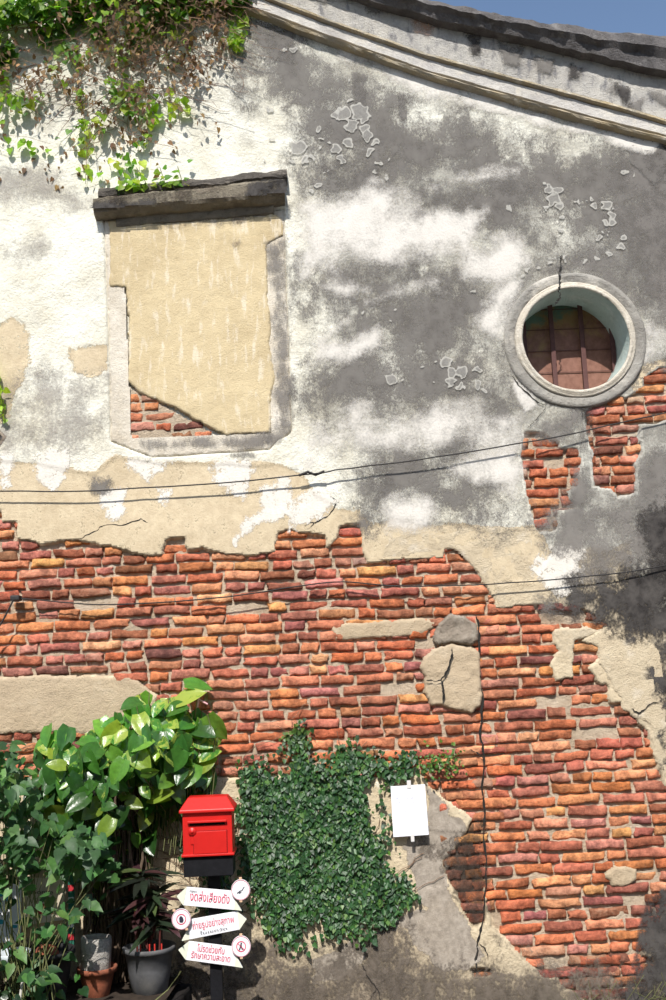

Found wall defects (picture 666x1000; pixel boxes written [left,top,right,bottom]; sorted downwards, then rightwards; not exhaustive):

leakage [91,16,666,540]
crack [555,256,563,305]
peeling [0,317,32,424]
peeling [67,344,107,377]
leakage [527,447,666,709]
spalling [0,358,666,1000]
crack [427,650,453,701]
crack [471,614,488,973]
leakage [170,926,211,1000]
leakage [222,889,666,1000]